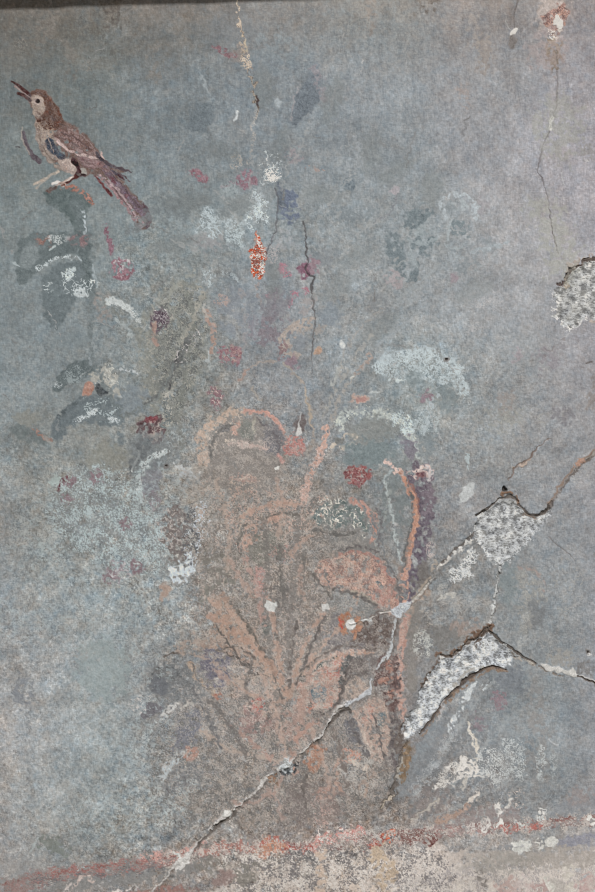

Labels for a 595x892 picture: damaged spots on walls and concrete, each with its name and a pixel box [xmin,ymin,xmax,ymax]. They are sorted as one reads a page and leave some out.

crack [263,186,281,260]
crack [535,116,561,257]
crack [300,220,318,379]
flaking render [552,256,595,332]
crack [545,449,595,507]
flaking render [447,491,553,586]
crack [344,531,477,708]
crack [487,563,595,686]
flaking render [400,627,519,738]
crack [279,758,294,774]
crack [379,738,415,814]
crack [149,850,193,892]